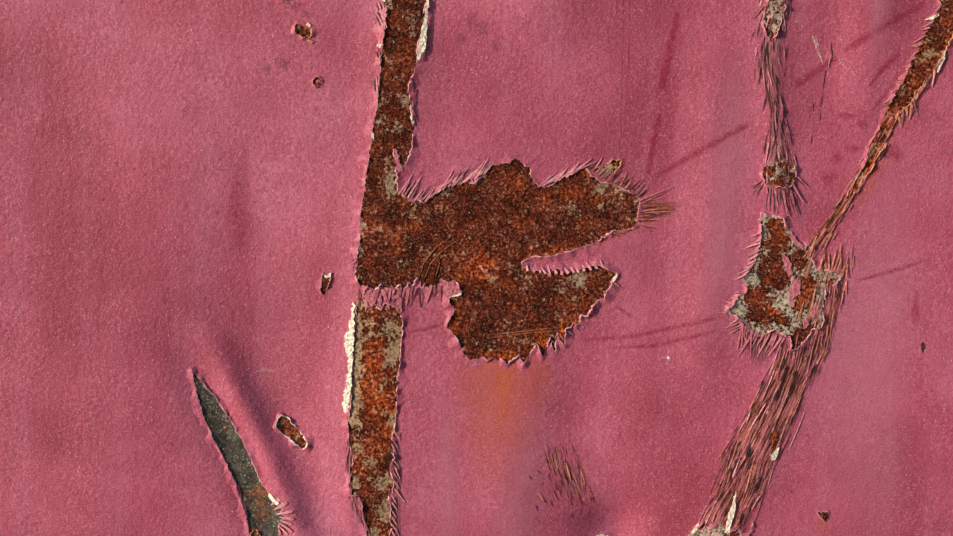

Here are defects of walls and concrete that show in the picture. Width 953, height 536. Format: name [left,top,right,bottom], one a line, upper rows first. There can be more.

corrosion [341,0,676,536]
corrosion [719,210,854,369]
spalling [186,364,294,536]
peeling [272,412,314,455]